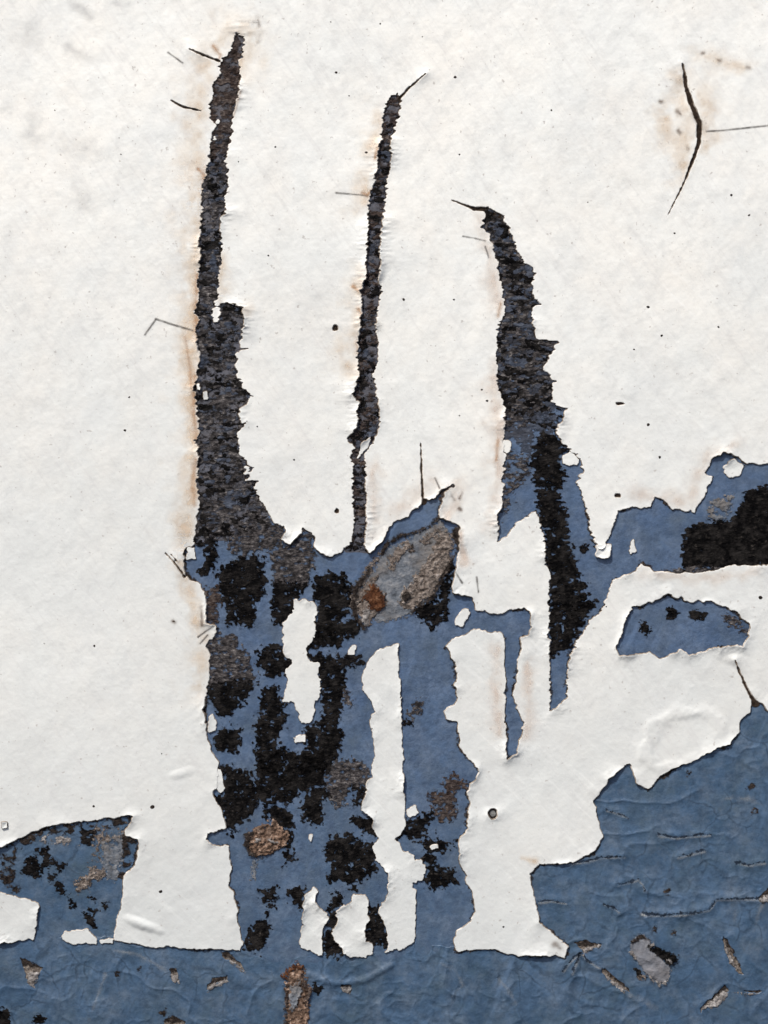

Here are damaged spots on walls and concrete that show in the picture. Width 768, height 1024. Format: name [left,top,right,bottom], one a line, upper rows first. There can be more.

peeling [193,33,272,544]
peeling [344,95,401,553]
peeling [481,209,768,710]
crack [672,64,764,206]
peeling [0,485,768,1024]